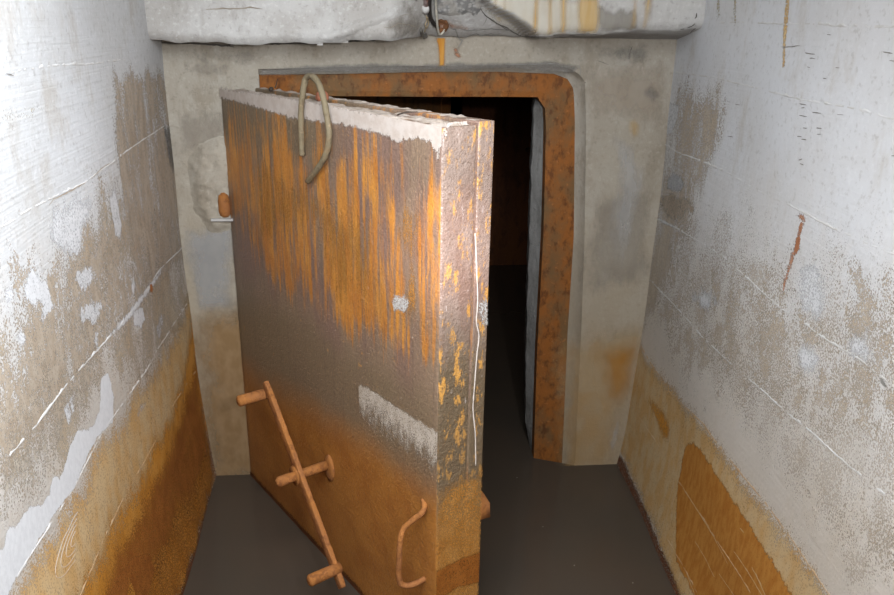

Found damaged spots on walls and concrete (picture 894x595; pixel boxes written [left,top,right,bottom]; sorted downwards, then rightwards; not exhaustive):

crack [206,4,261,12]
spalling [433,0,490,16]
crack [161,40,234,48]
crack [263,39,307,47]
corrosion [437,38,460,65]
corrosion [783,214,805,291]
water stain [0,66,251,595]
water stain [642,76,894,584]
water stain [617,348,828,595]